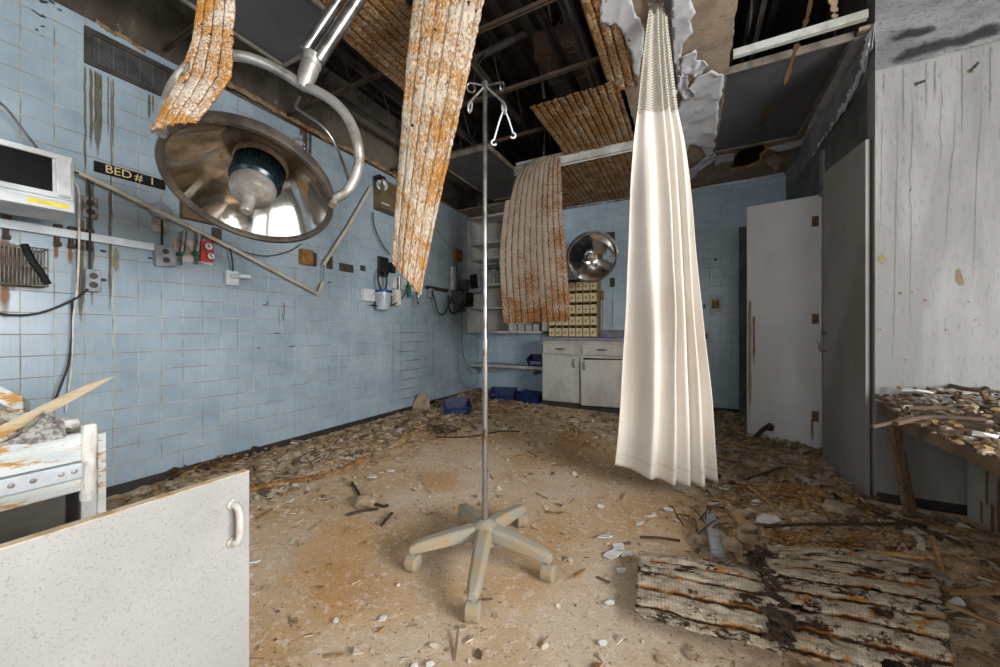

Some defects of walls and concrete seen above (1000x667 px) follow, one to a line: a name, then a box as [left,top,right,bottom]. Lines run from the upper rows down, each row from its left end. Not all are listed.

peeling [600,0,644,80]
peeling [671,0,805,192]
damp [83,68,119,295]
flaking render [440,195,469,209]
damp [78,218,94,313]